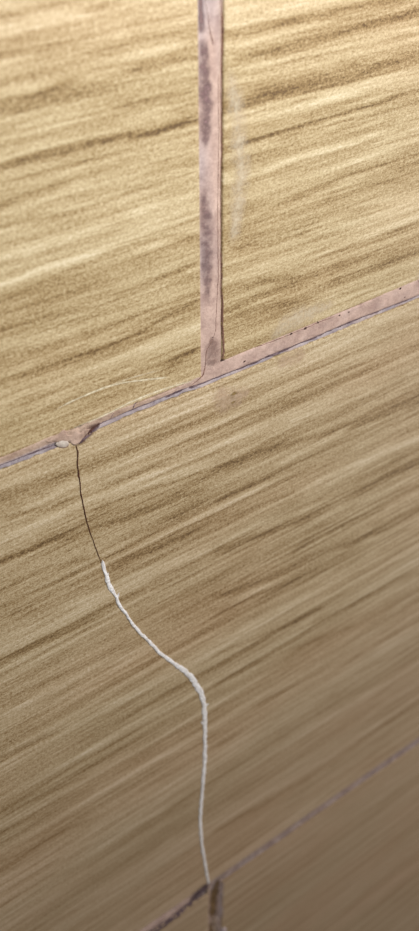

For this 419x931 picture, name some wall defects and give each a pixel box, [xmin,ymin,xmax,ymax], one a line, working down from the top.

crack [0,445,53,466]
crack [76,295,418,931]